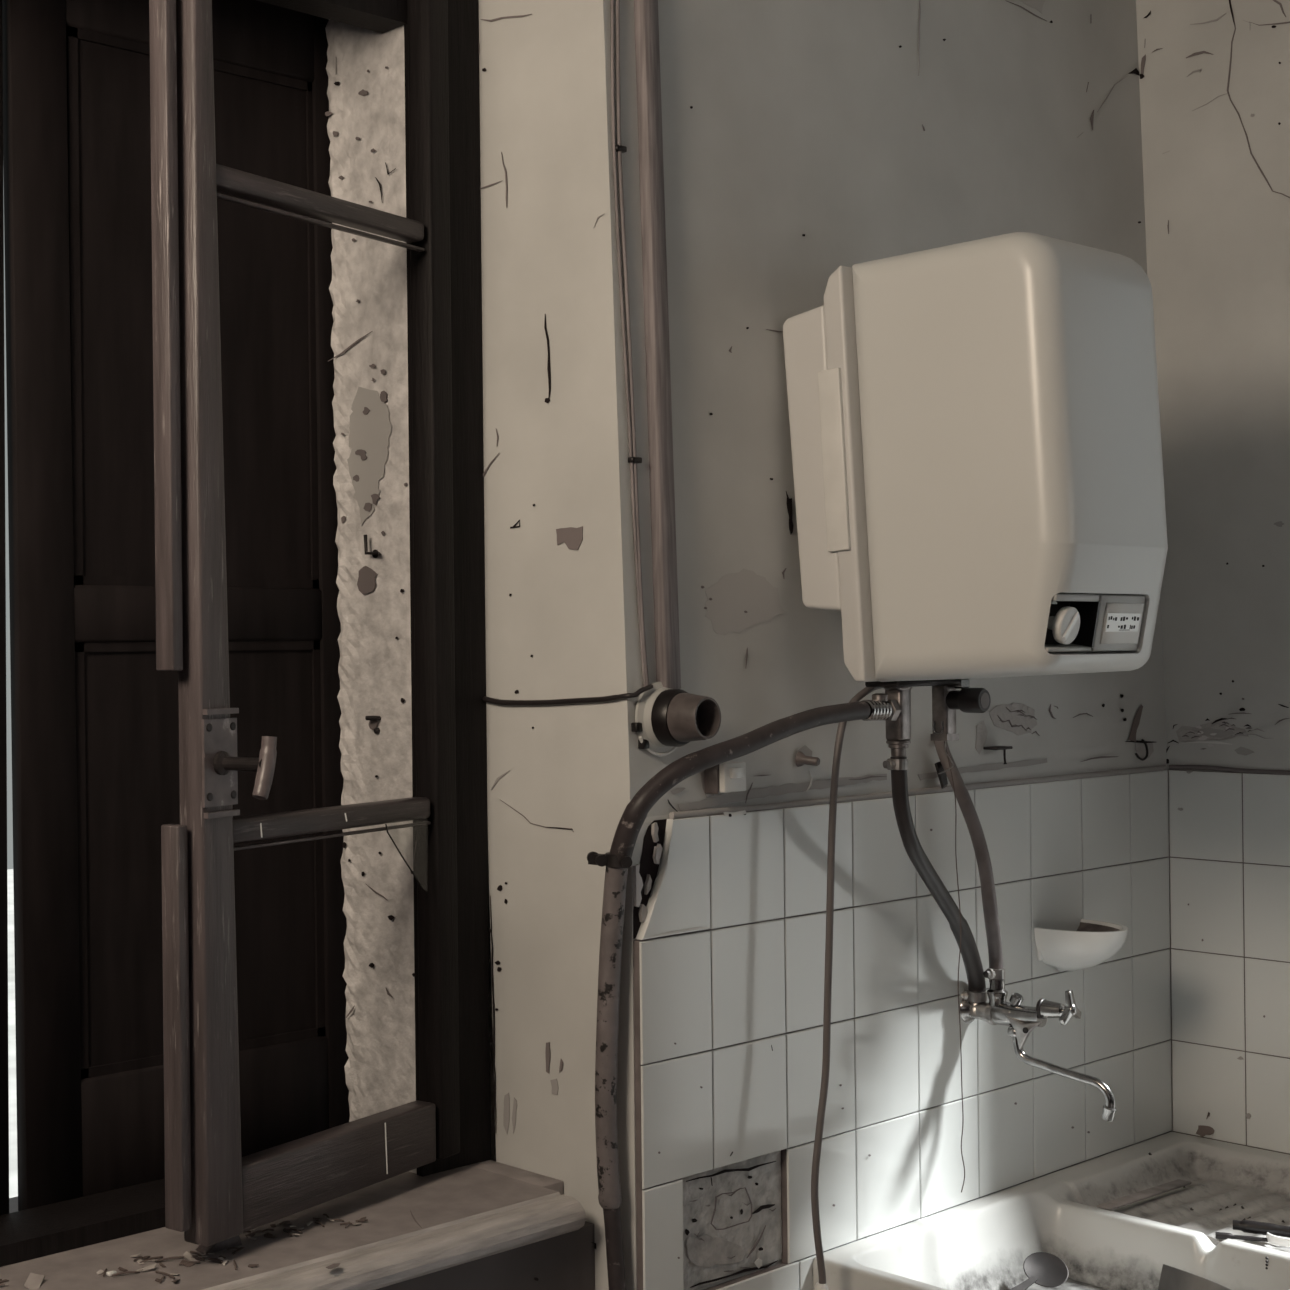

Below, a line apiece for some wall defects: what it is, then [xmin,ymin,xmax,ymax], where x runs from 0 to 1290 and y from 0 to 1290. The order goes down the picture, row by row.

crack [1193,0,1290,198]
spalling [975,703,1040,754]
peeling [1176,698,1251,750]
crack [501,800,573,831]
peeling [682,1150,782,1290]